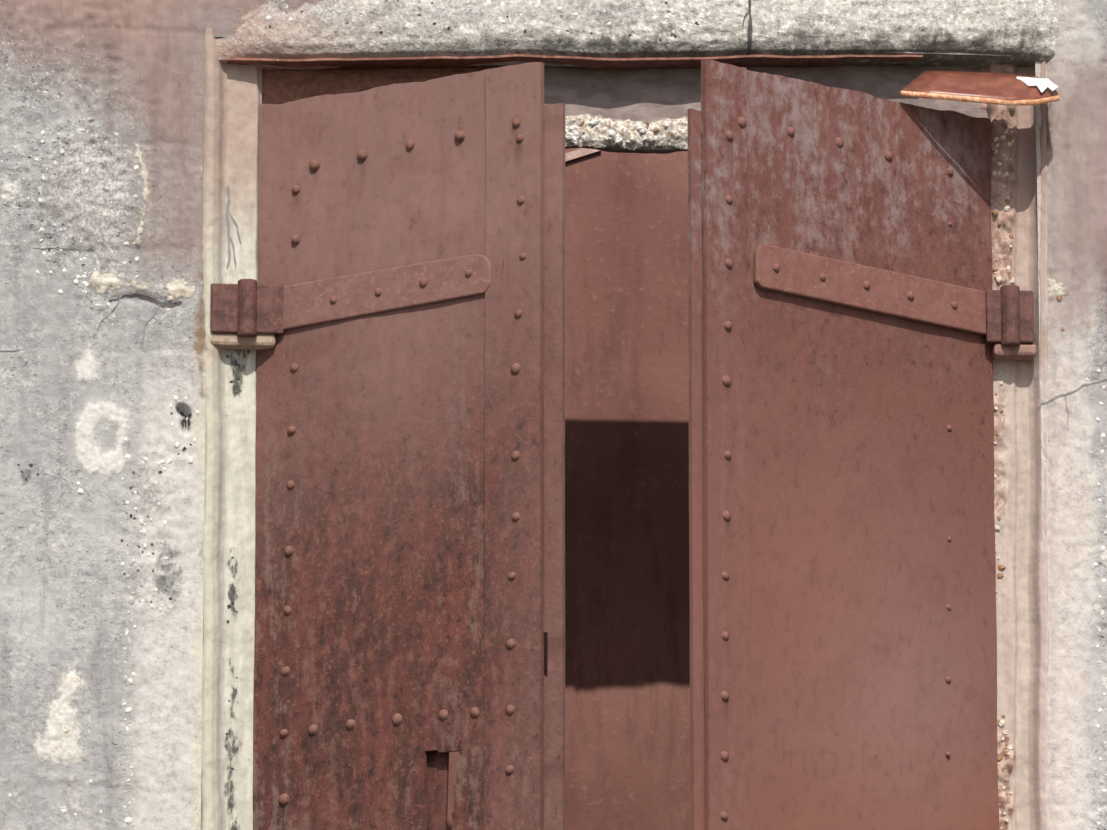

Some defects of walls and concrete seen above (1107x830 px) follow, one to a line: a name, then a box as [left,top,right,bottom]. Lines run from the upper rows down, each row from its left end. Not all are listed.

rust [262,69,464,103]
spalling [991,109,1015,226]
crack [35,247,196,342]
spalling [992,266,1015,285]
spalling [169,395,199,429]
crack [1038,360,1107,430]
spalling [121,438,197,824]
spalling [997,715,1013,762]